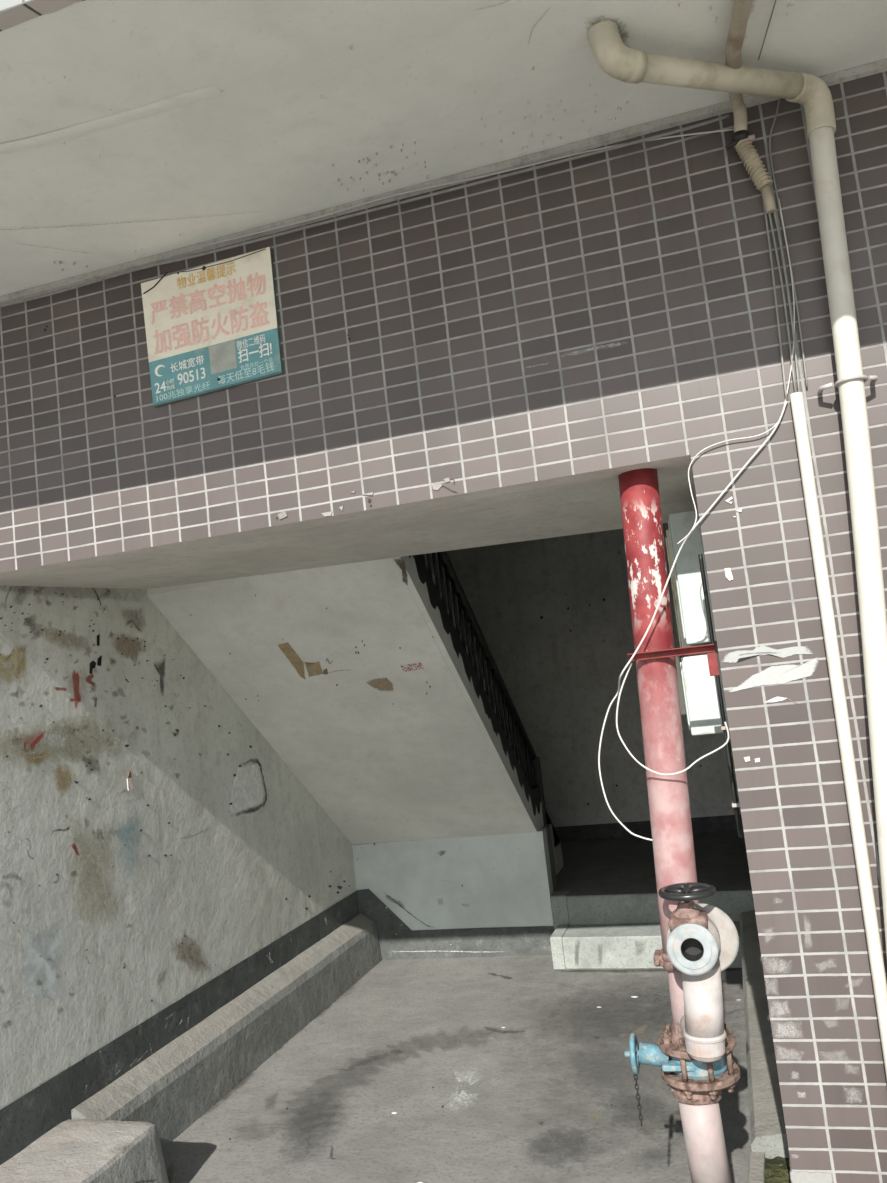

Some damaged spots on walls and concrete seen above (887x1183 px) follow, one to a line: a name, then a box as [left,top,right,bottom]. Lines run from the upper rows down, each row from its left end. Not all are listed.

peeling [107,612,174,710]
peeling [278,639,338,686]